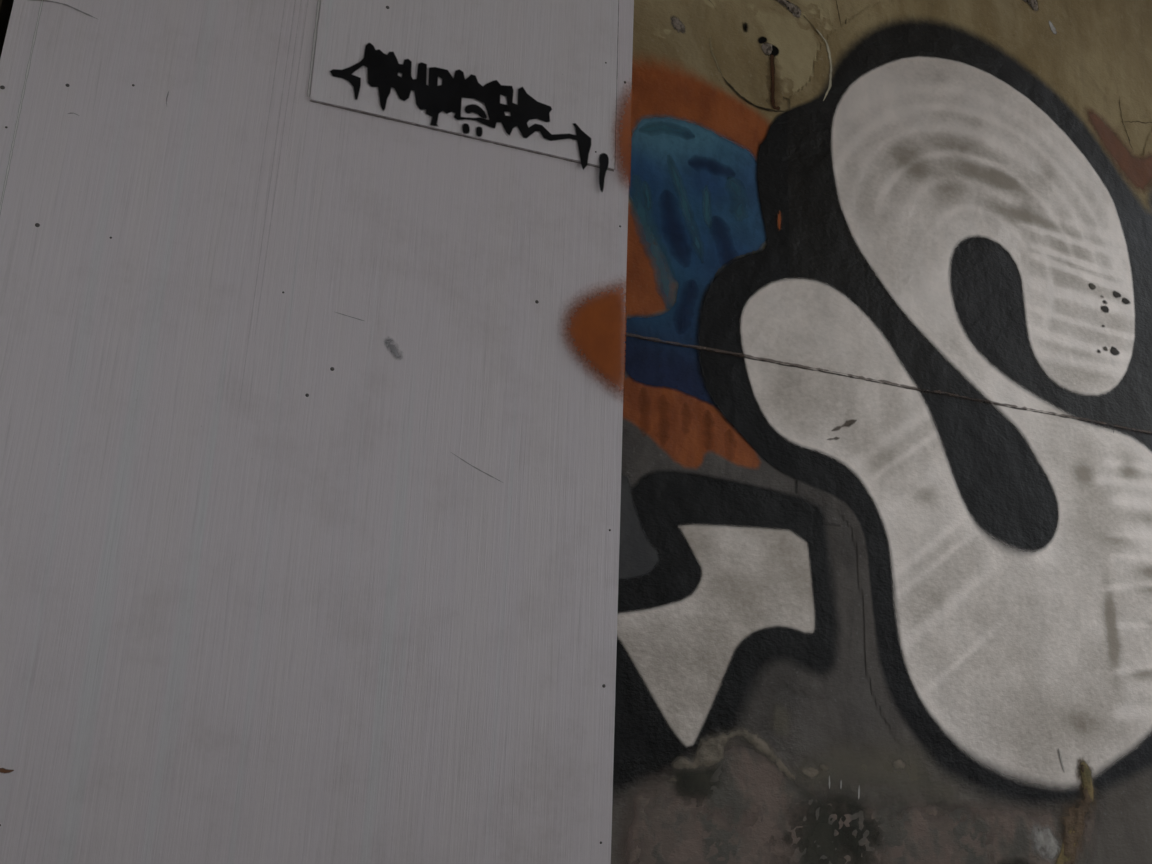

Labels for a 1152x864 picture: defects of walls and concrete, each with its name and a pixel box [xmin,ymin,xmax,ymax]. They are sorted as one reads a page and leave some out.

corrosion [770,54,780,110]
crack [626,333,1152,434]